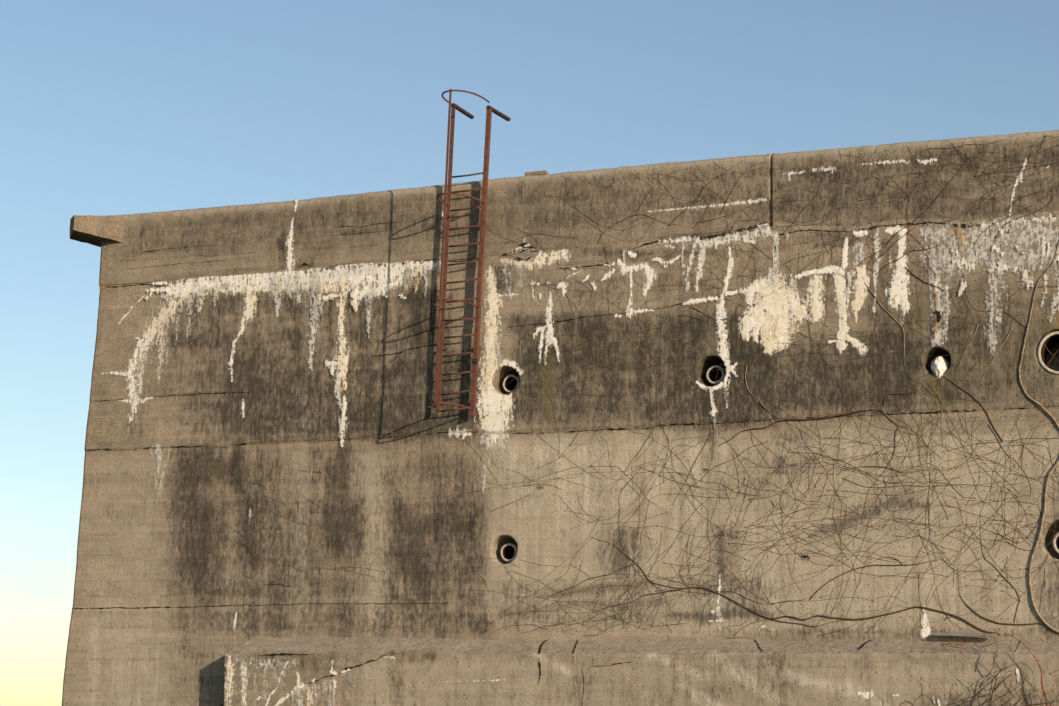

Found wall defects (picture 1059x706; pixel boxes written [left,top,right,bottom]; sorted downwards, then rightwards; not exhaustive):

damp [862,158,937,166]
damp [102,199,441,447]
damp [448,160,1059,493]
damp [150,444,171,495]
damp [224,654,366,706]
crack [538,640,547,684]
crack [573,640,634,700]